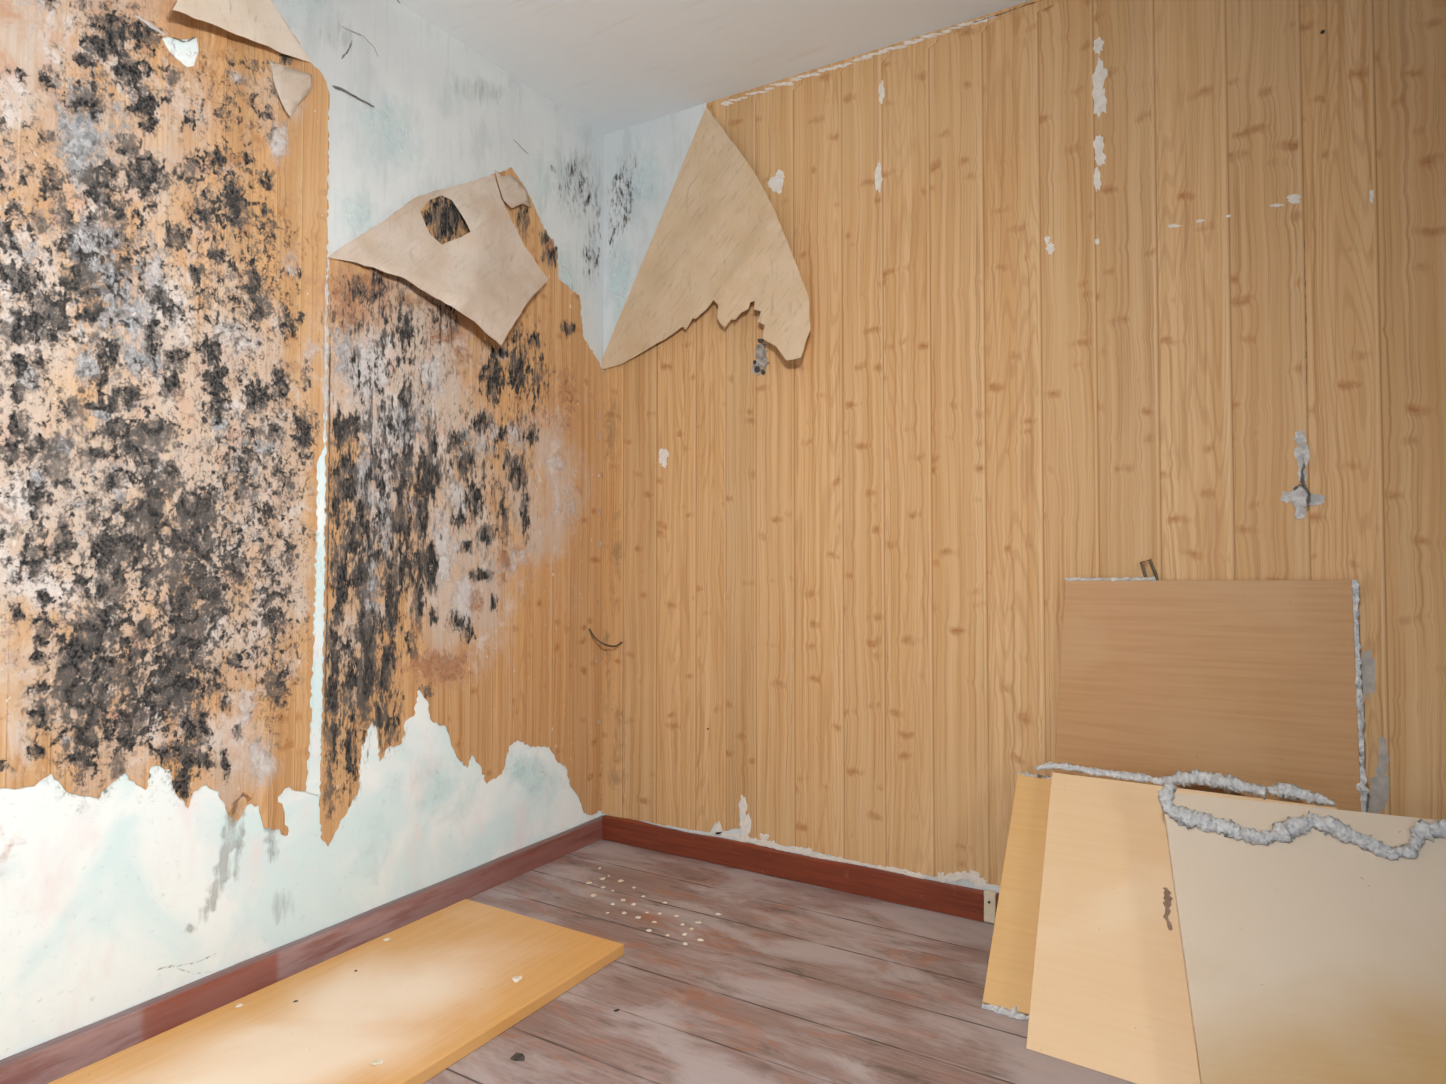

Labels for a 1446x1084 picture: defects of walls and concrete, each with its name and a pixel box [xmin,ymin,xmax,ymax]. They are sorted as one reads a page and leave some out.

peeling [1092,37,1108,118]
leakage [551,162,600,217]
peeling [768,170,785,194]
peeling [1093,135,1106,191]
leakage [561,321,576,337]
leakage [0,0,573,818]
flaking render [0,437,601,1060]
leakage [205,792,251,911]